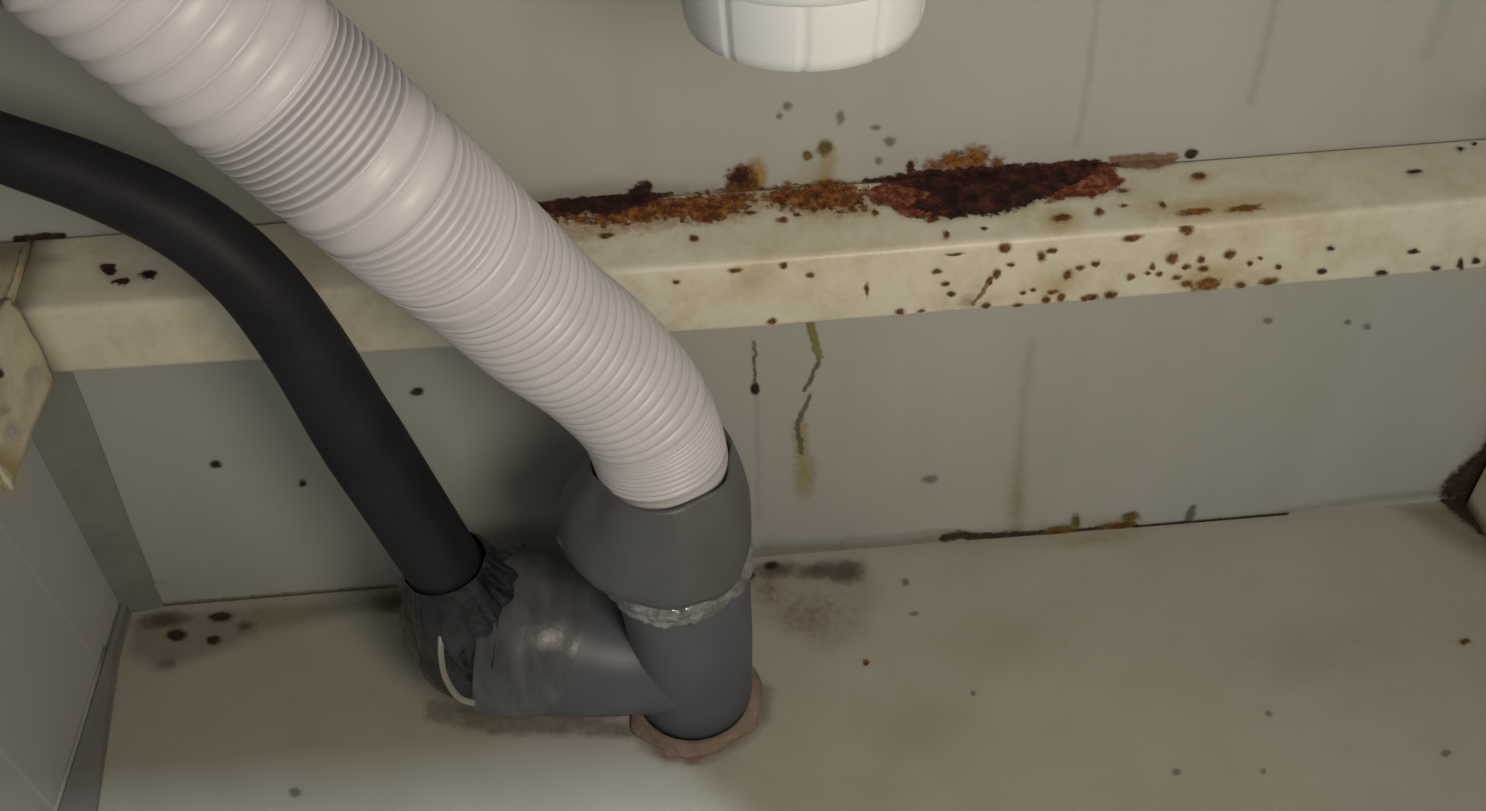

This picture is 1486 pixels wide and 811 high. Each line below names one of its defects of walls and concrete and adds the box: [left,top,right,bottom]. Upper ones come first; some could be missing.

corrosion [538,126,1206,309]
corrosion [1160,201,1263,236]
corrosion [1013,250,1282,307]
corrosion [795,322,823,484]
corrosion [939,512,1138,542]
leakage [810,564,857,579]
leakage [151,586,395,645]